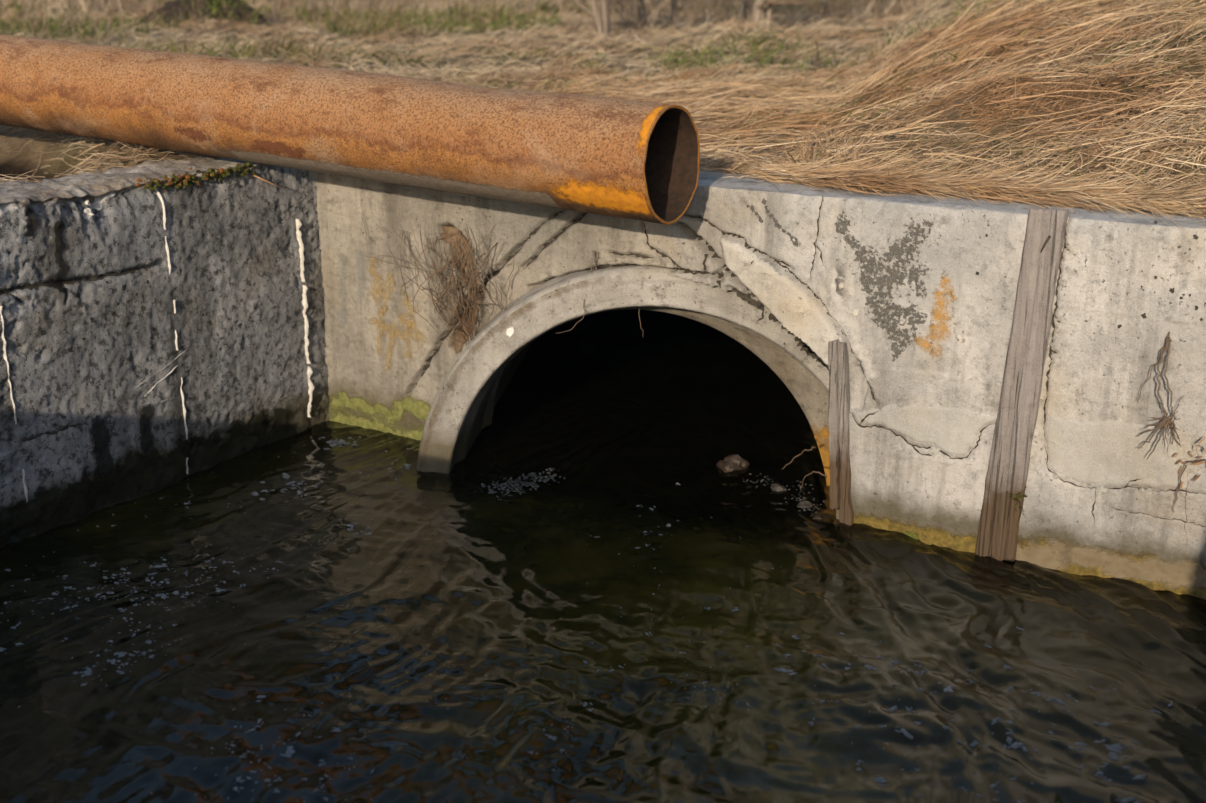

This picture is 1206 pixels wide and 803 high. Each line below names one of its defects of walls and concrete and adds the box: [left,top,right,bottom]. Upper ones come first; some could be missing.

rust [174,126,212,141]
rust [253,140,305,158]
rust [639,104,669,156]
rust [553,181,650,215]
leakage [0,306,17,424]
leakage [48,221,70,293]
crack [0,263,156,303]
leakage [301,285,314,418]
crack [416,196,996,460]
rust [917,277,964,351]
leakage [90,415,114,476]
leakage [139,377,188,454]